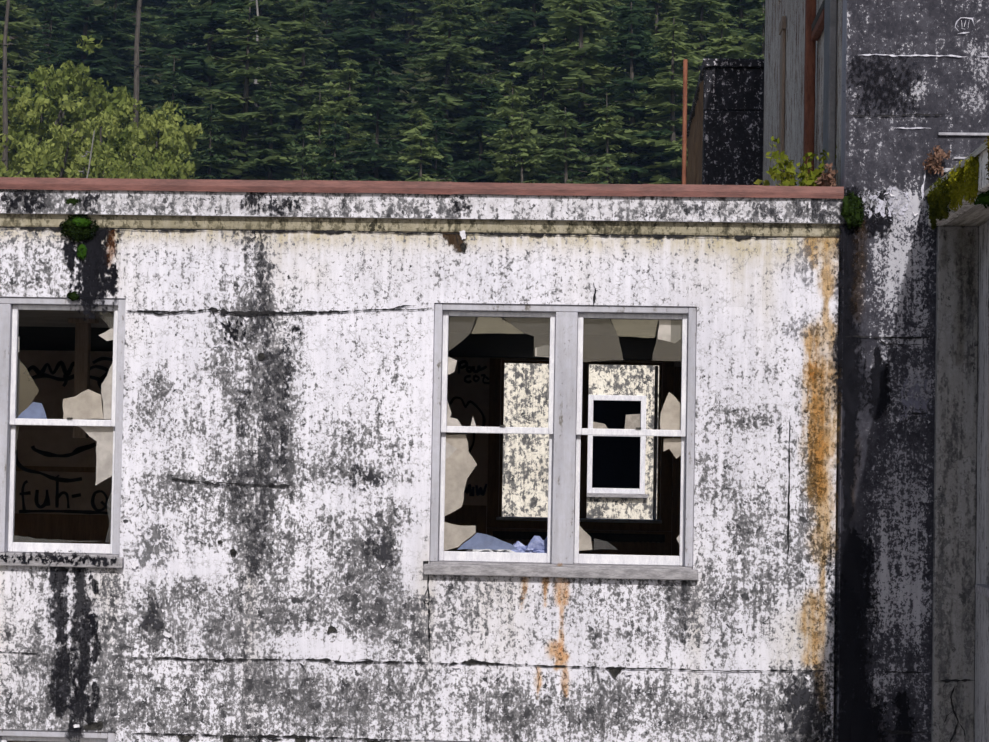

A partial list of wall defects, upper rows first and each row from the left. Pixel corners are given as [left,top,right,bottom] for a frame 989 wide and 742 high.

leakage [1,189,46,215]
leakage [240,192,300,216]
leakage [61,228,123,321]
crack [127,305,428,337]
crack [171,478,291,488]
leakage [221,229,296,577]
rust [801,228,842,664]
leakage [752,185,917,742]
leakage [0,550,117,742]
crack [133,575,827,689]
rust [544,577,569,695]
crack [875,670,973,742]